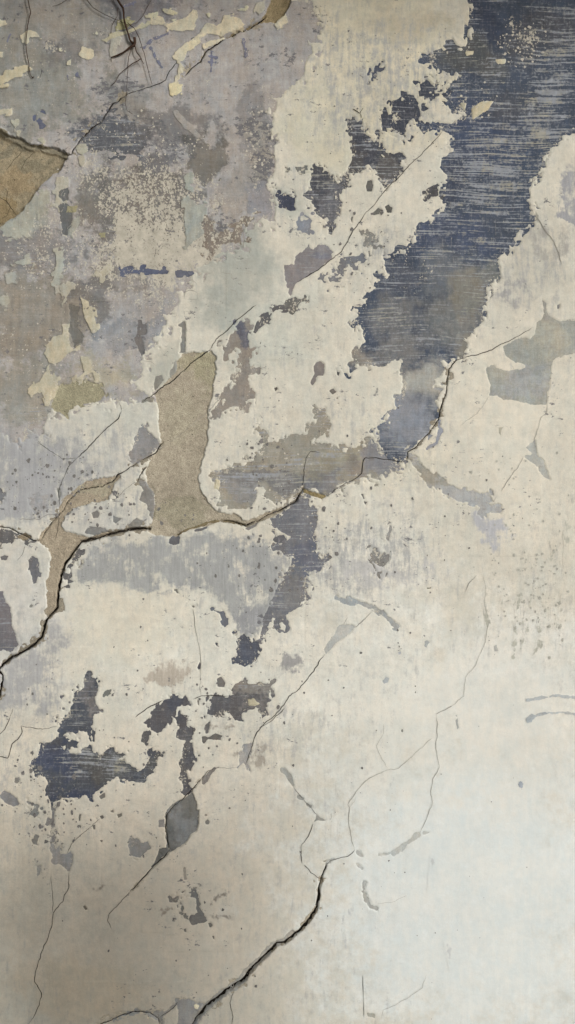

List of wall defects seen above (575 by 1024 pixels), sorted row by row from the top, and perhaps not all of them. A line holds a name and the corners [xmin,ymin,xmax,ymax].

crack [72,18,264,156]
crack [293,131,443,284]
crack [0,272,256,758]
crack [219,451,319,527]
peeling [0,0,575,667]
crack [329,330,529,495]
peeling [0,671,276,876]
crack [95,576,489,1024]